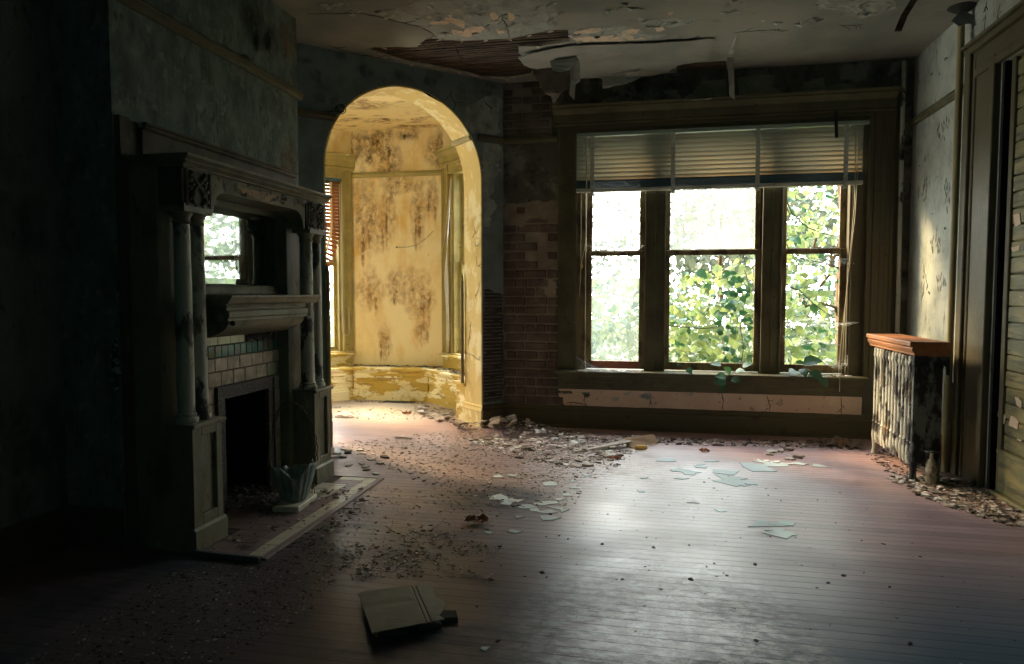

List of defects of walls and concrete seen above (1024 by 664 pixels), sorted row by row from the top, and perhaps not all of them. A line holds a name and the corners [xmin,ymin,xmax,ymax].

peeling [352,375,426,399]
flaking render [463,79,590,405]